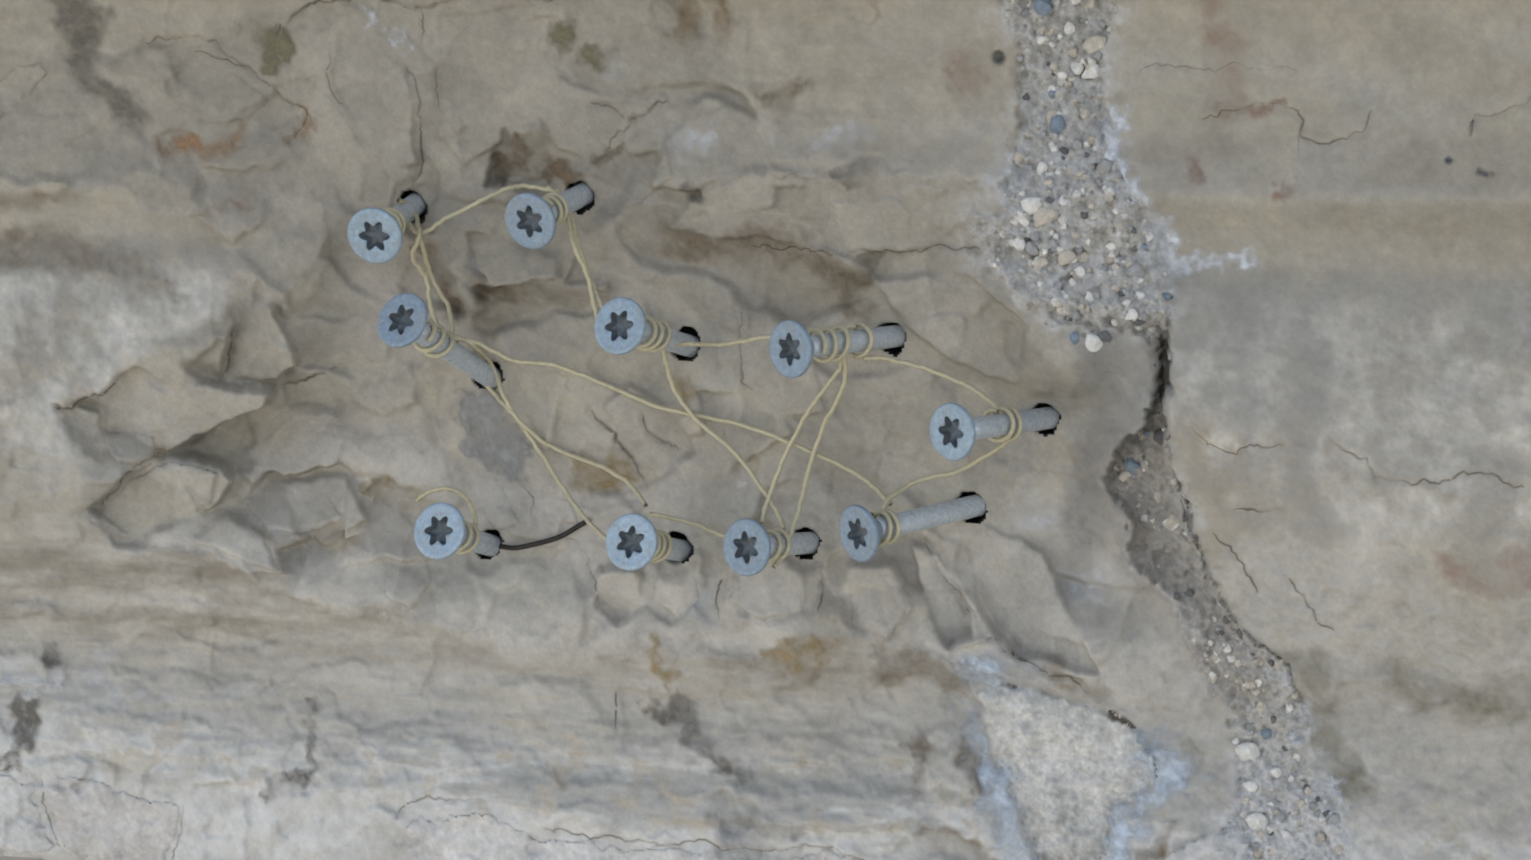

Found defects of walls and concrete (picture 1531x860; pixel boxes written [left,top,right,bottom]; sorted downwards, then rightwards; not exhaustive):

spalling [0,0,1210,712]
crack [1155,339,1164,403]